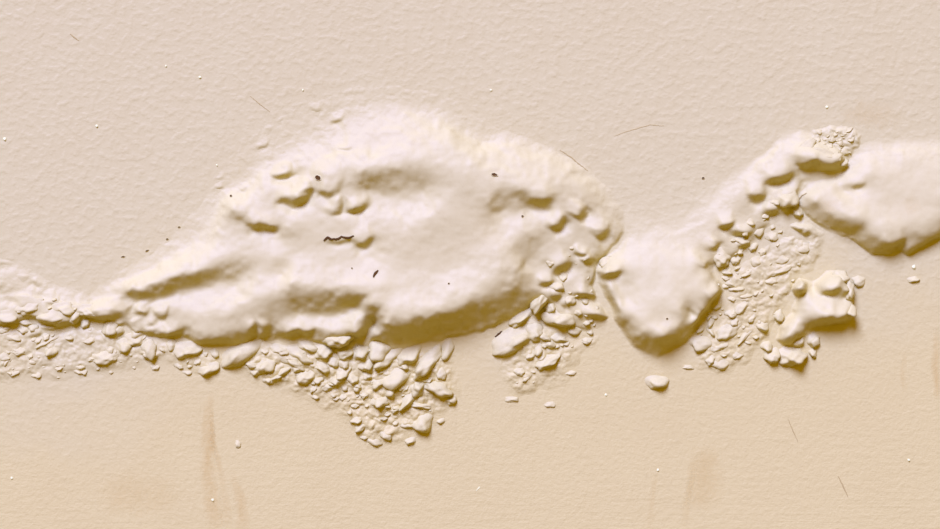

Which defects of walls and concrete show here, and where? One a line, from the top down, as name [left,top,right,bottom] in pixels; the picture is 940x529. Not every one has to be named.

peeling [682,205,825,378]
peeling [0,318,463,449]
peeling [491,308,600,407]